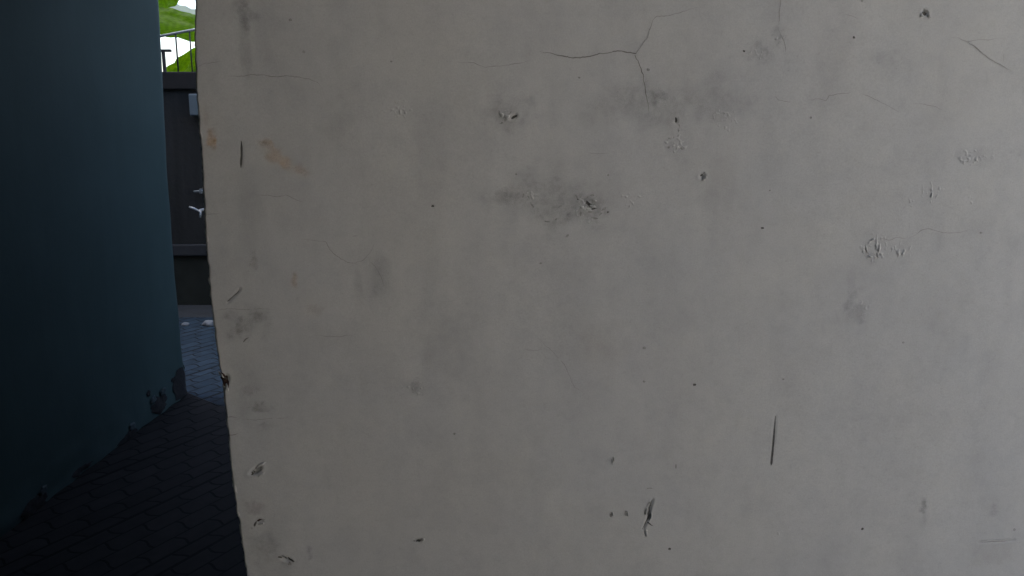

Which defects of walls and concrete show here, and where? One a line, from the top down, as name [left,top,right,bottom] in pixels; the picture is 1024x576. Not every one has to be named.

crack [461,7,697,111]